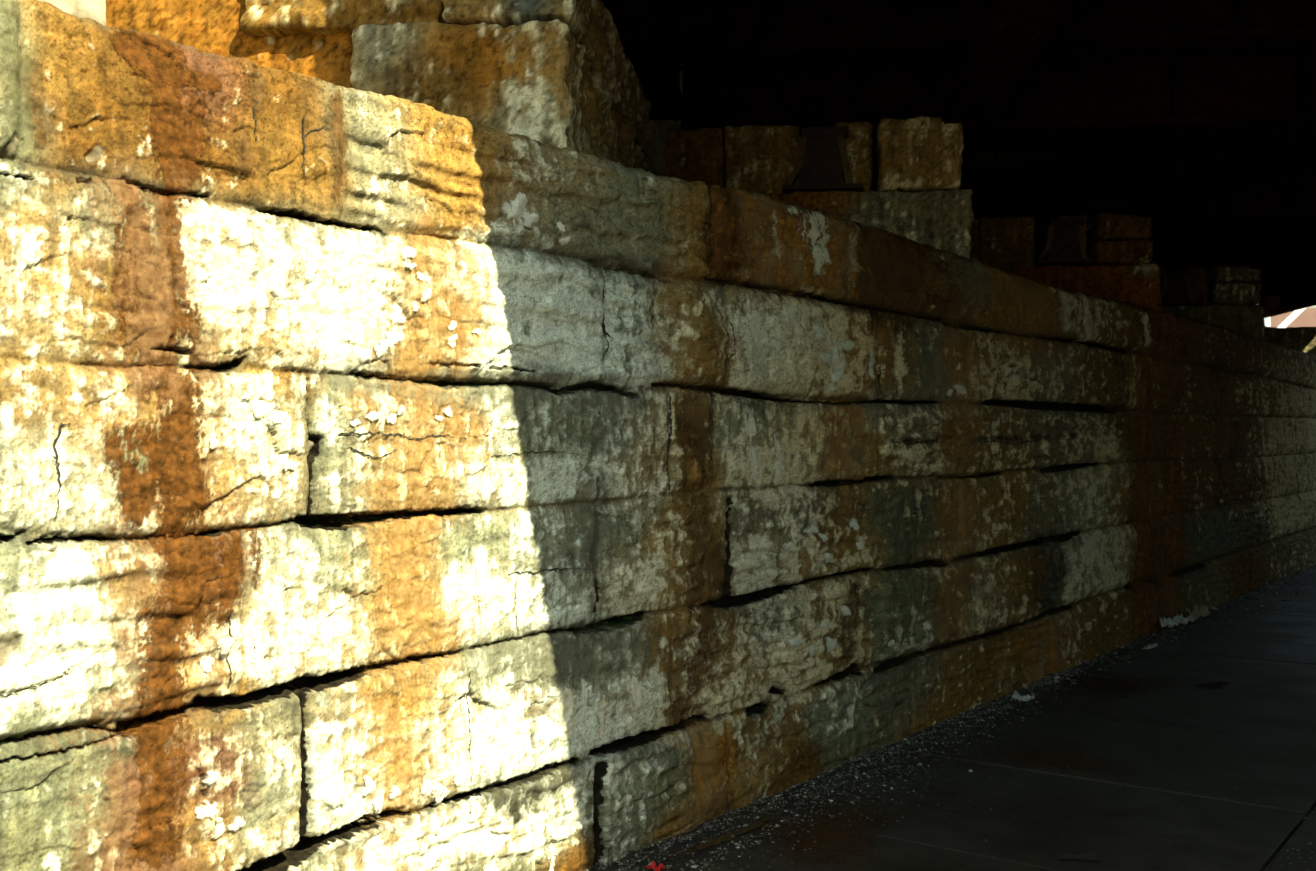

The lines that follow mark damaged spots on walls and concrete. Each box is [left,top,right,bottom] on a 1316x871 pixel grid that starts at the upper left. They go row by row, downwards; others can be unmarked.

rust [329,88,350,208]
crack [50,423,71,519]
rust [101,27,265,871]
rust [338,215,492,818]
crack [338,431,579,459]
rust [647,255,746,729]
rust [833,579,865,667]